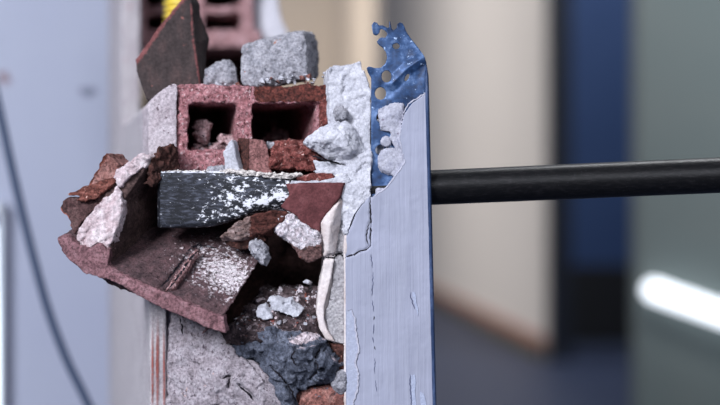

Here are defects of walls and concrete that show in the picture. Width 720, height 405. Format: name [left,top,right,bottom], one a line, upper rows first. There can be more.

flaking render [290,61,425,235]
spalling [58,84,281,405]
crack [326,200,377,391]
peeling [346,309,359,405]